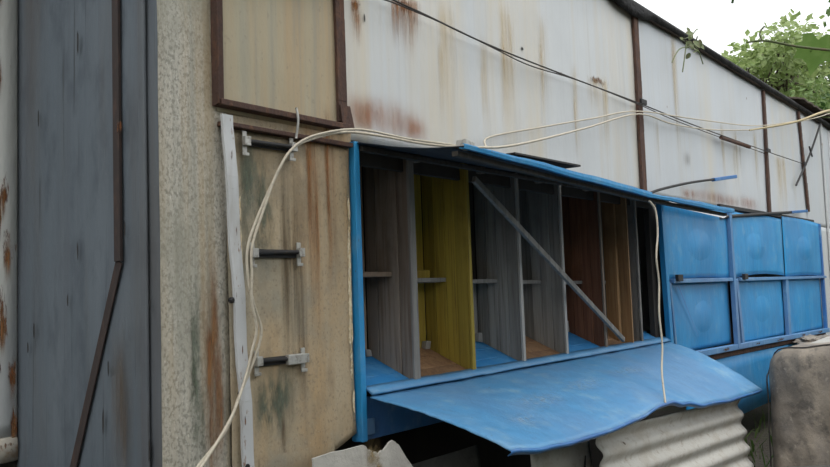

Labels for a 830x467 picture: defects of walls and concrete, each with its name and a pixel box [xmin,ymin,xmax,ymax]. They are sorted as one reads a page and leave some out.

rust [0,180,9,220]